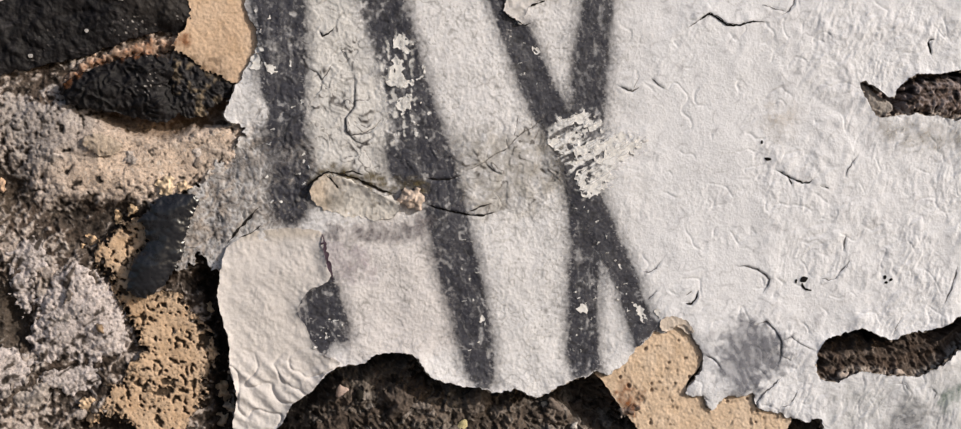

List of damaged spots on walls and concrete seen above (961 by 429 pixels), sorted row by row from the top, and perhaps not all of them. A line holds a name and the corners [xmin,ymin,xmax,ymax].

peeling [386,34,431,138]
spalling [860,71,961,121]
spalling [0,0,264,429]
peeling [295,153,400,221]
crack [430,203,498,217]
crack [430,111,550,180]
peeling [547,109,649,223]
peeling [217,228,822,429]
spalling [816,317,961,382]